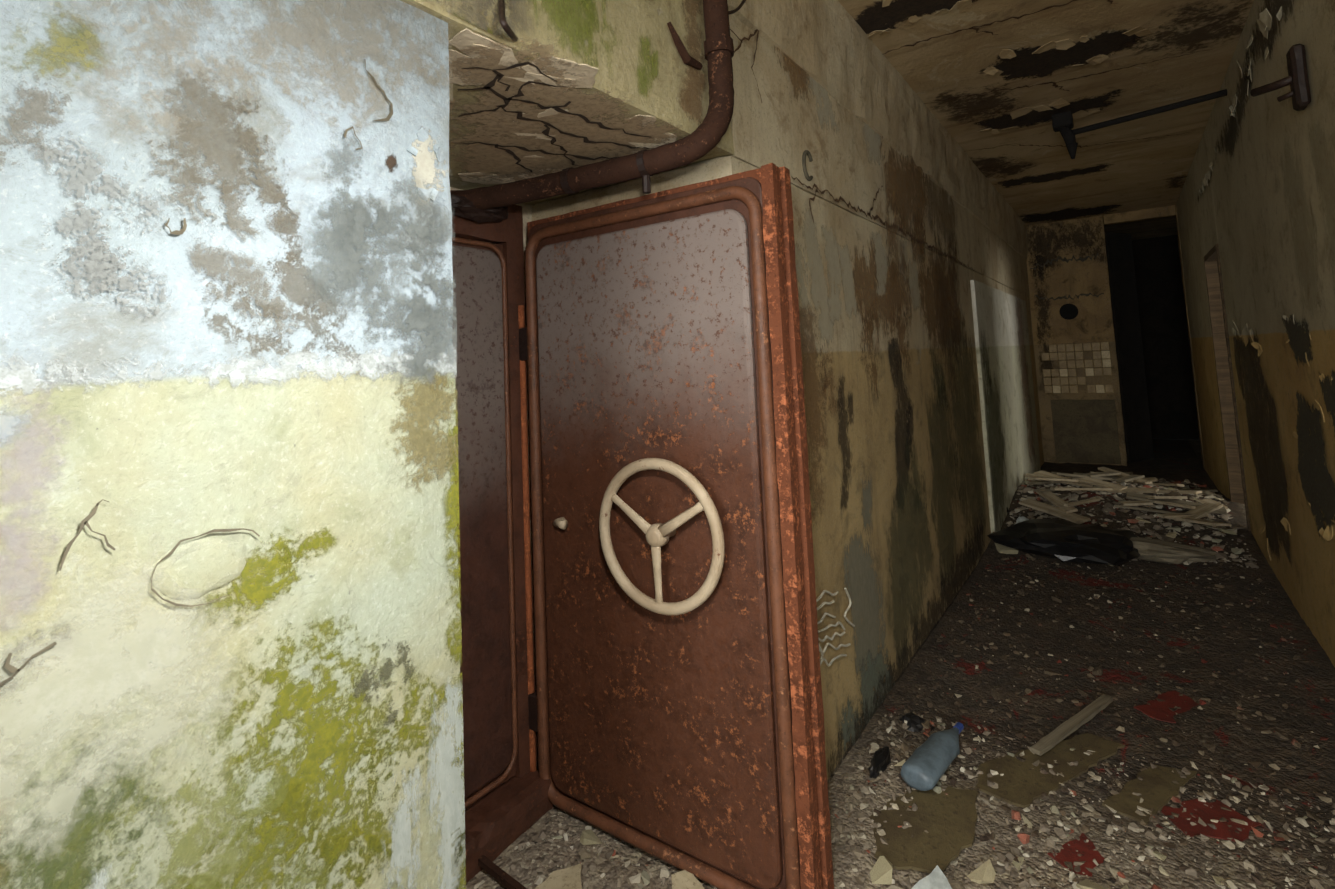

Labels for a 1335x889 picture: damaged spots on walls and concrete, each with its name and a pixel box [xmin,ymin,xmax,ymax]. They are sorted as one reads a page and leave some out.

crack [457,62,651,172]
spalling [855,0,978,39]
spalling [980,26,1153,80]
peeling [1197,0,1294,201]
damp [0,78,459,489]
damp [828,149,991,780]
peeling [1232,314,1335,564]
crack [59,499,115,571]
crack [151,528,260,607]
damp [282,528,335,569]
crack [0,642,57,687]
damp [171,636,466,889]